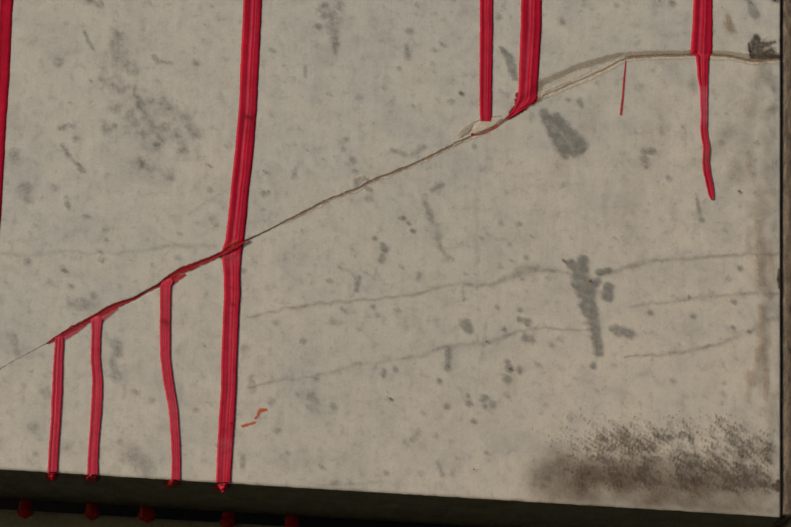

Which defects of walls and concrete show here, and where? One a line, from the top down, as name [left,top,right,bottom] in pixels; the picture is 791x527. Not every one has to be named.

crack [246,51,779,240]
mould [535,408,773,508]